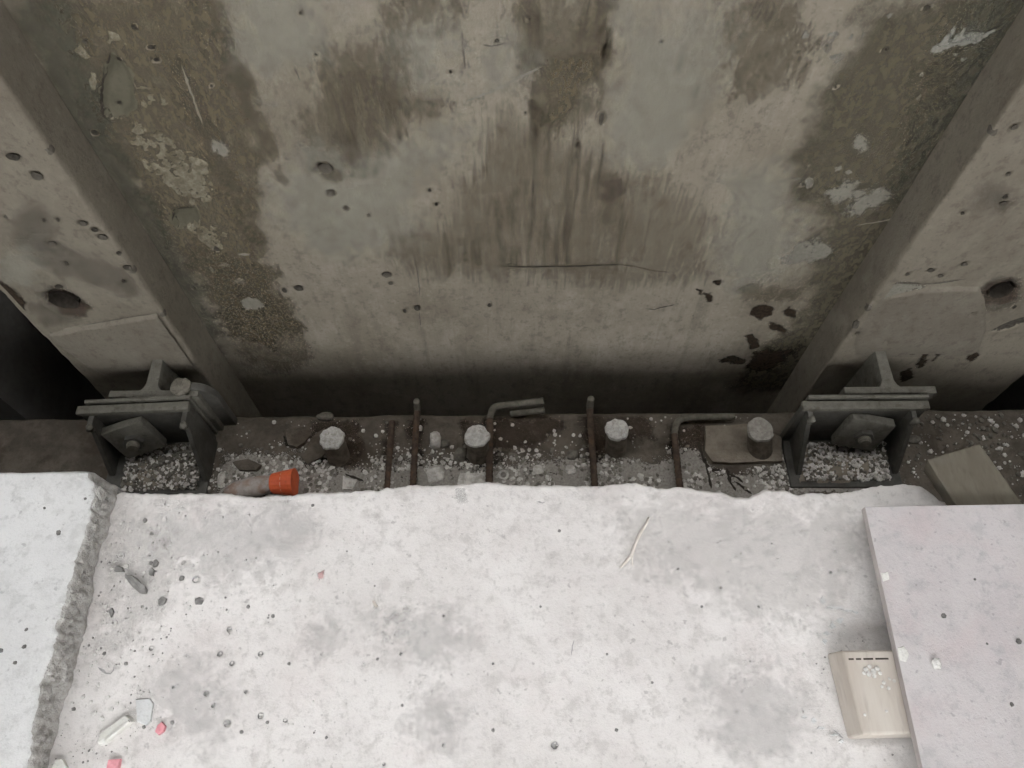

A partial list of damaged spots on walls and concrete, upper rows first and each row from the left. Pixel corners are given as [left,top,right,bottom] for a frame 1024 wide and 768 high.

damp [305,0,448,181]
damp [512,0,619,128]
peeling [930,26,996,61]
peeling [89,31,230,206]
damp [20,0,308,371]
peeling [824,165,892,217]
damp [719,0,1024,393]
peeling [187,219,227,250]
crack [504,263,663,272]
corrosion [460,415,564,468]
corrosion [581,416,654,464]
corrosion [668,423,705,454]